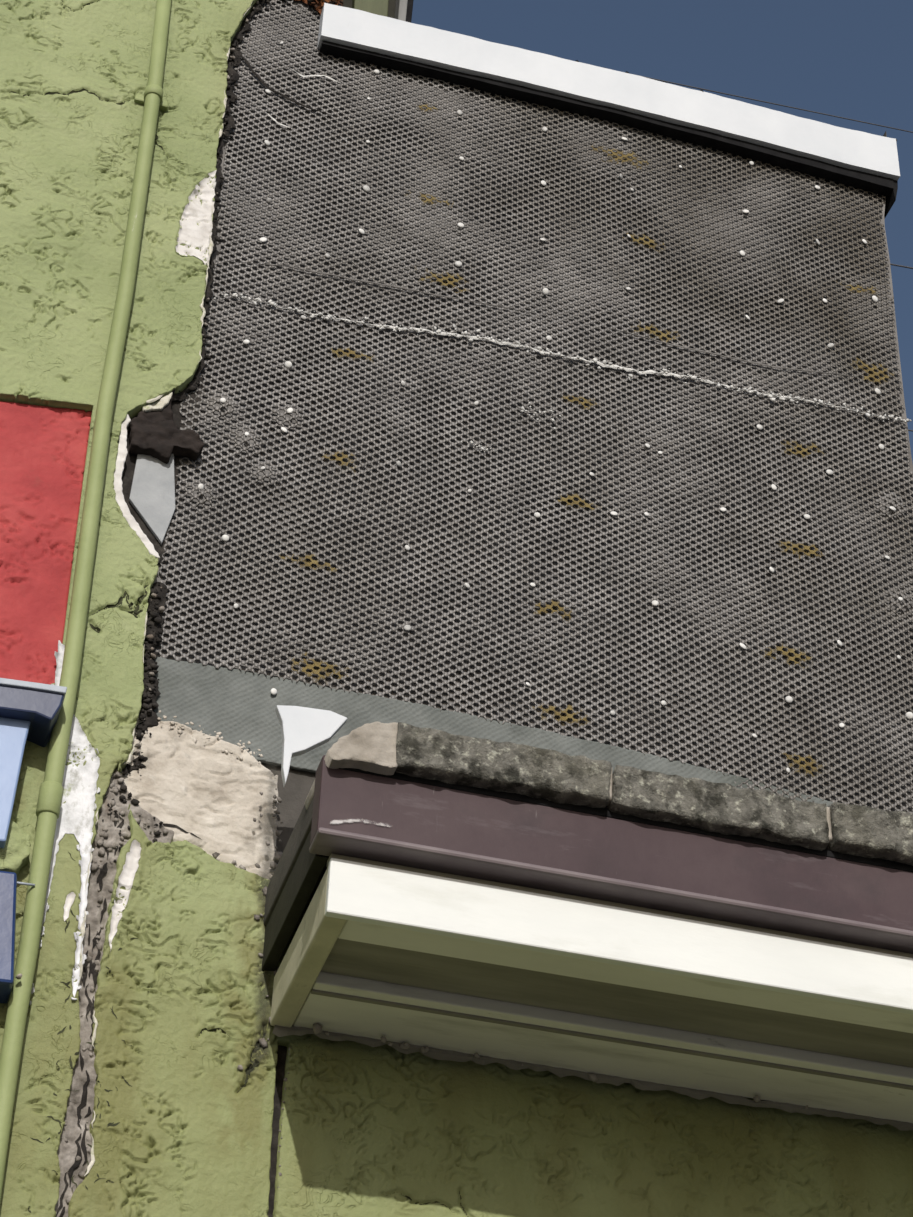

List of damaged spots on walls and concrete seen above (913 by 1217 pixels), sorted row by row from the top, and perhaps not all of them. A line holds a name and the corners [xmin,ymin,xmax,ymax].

rust [295,0,343,14]
spalling [113,0,270,564]
rust [558,494,595,510]
rust [779,541,824,559]
rust [281,554,336,571]
rust [535,600,571,618]
rust [292,652,349,680]
rust [766,646,812,668]
rust [533,705,587,725]
spalling [115,580,283,880]
rust [783,753,822,776]
crack [28,768,174,1217]